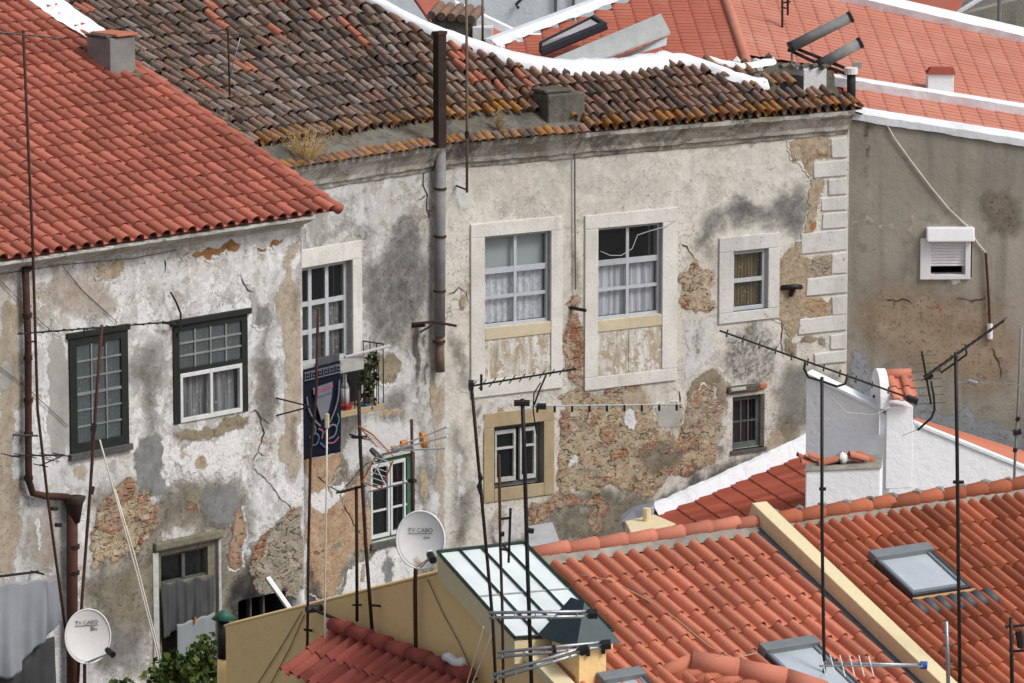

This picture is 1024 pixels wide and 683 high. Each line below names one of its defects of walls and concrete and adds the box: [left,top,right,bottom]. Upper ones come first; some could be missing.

water stain [703,189,810,242]
flaking render [493,136,834,543]
flaking render [61,456,161,571]
crack [250,410,292,509]
spalling [174,233,410,600]